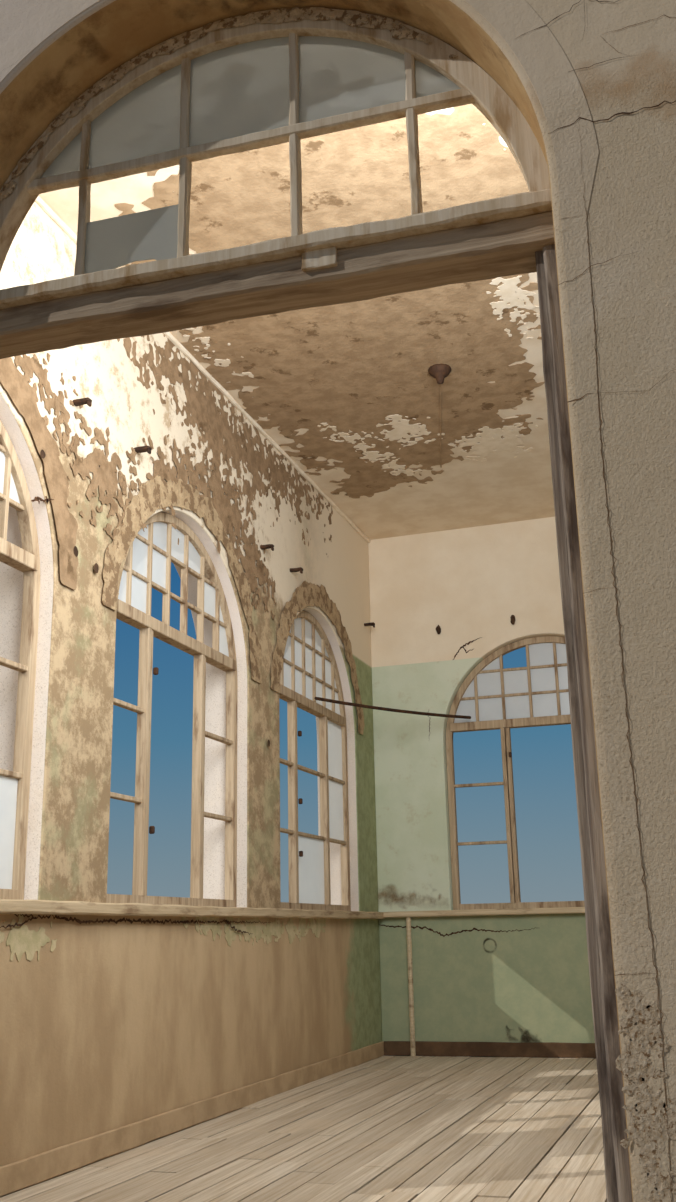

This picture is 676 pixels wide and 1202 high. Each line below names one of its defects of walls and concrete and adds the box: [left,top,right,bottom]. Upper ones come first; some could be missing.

crack [517,0,676,72]
peeling [115,104,529,255]
crack [548,101,675,139]
peeling [0,273,545,735]
crack [559,171,676,1202]
crack [0,914,269,935]
flaking render [615,981,676,1202]